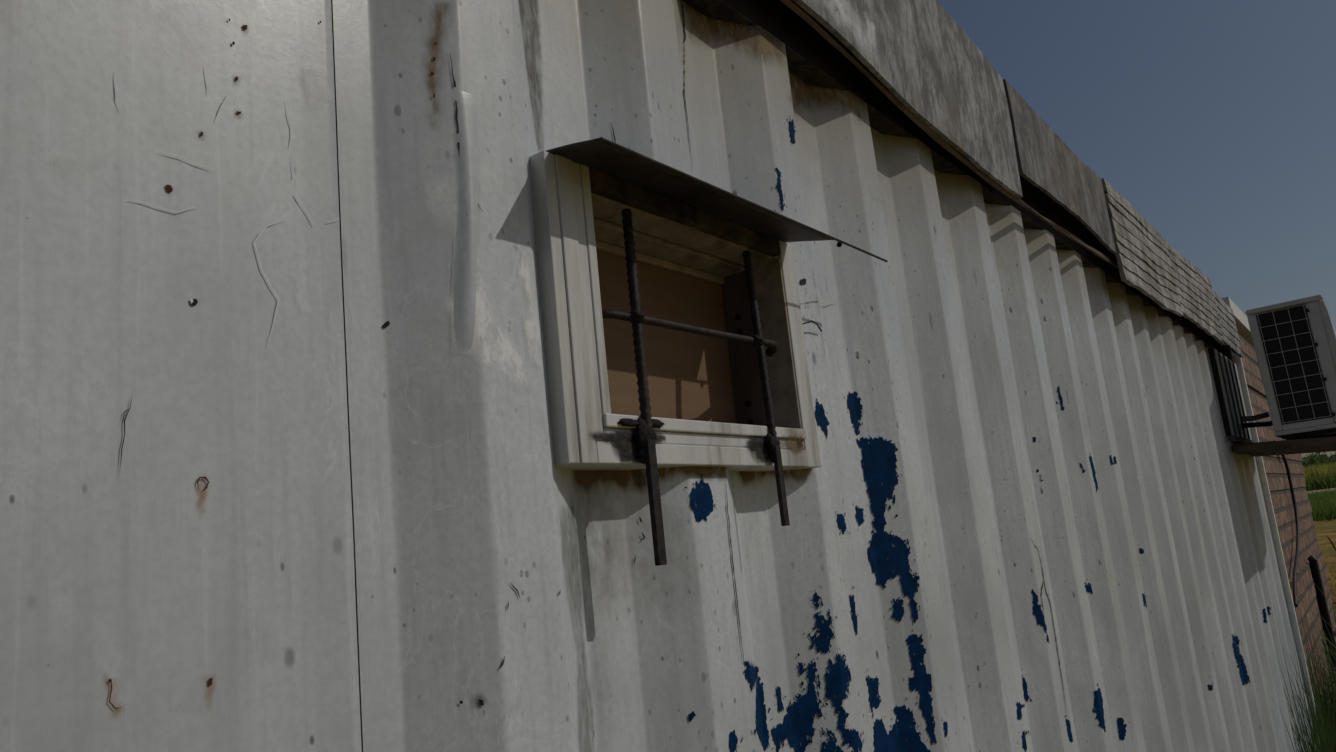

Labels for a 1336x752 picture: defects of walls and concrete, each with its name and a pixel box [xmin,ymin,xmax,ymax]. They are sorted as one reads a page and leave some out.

corrosion [430,10,442,98]
peeling [677,475,718,523]
peeling [729,391,948,752]
peeling [1031,589,1050,643]
peeling [1232,634,1250,685]